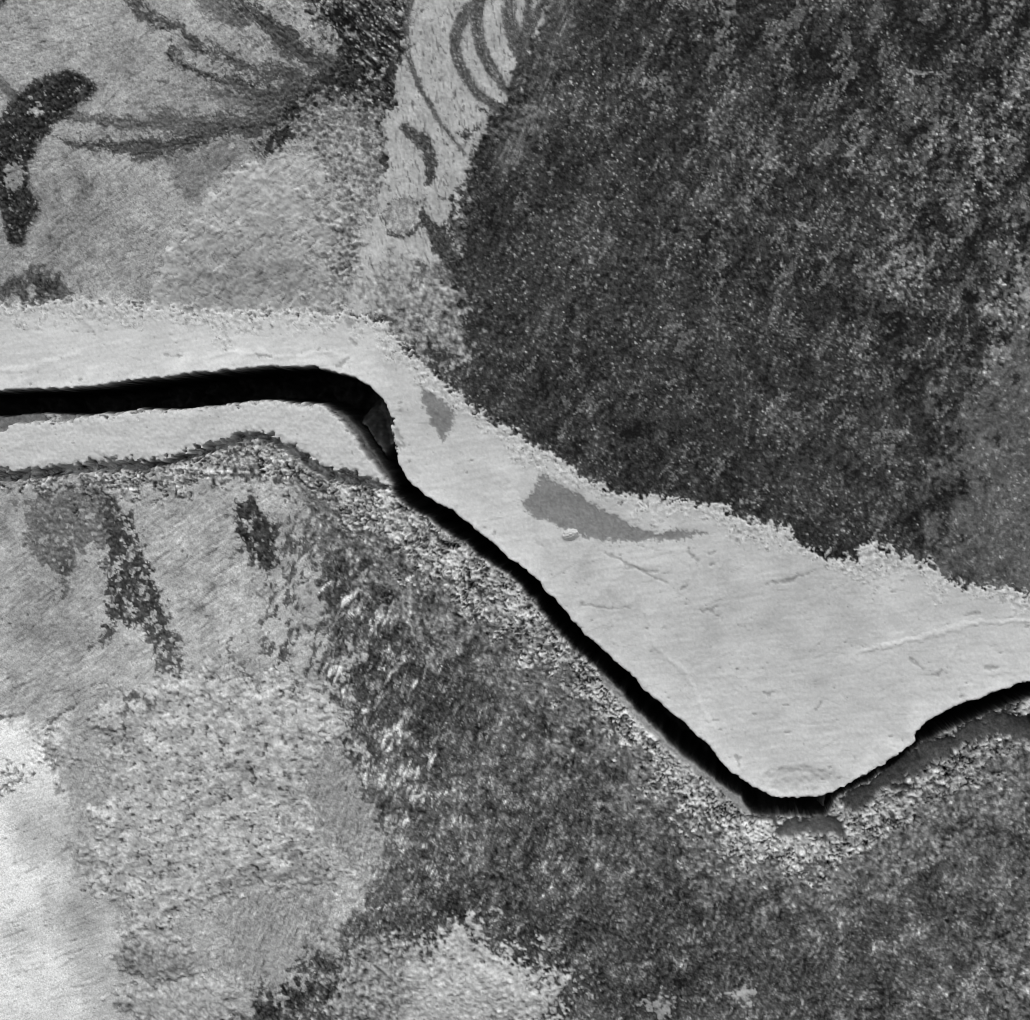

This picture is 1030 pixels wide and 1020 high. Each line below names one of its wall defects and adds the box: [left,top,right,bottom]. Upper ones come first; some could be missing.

crack [0,365,1030,817]